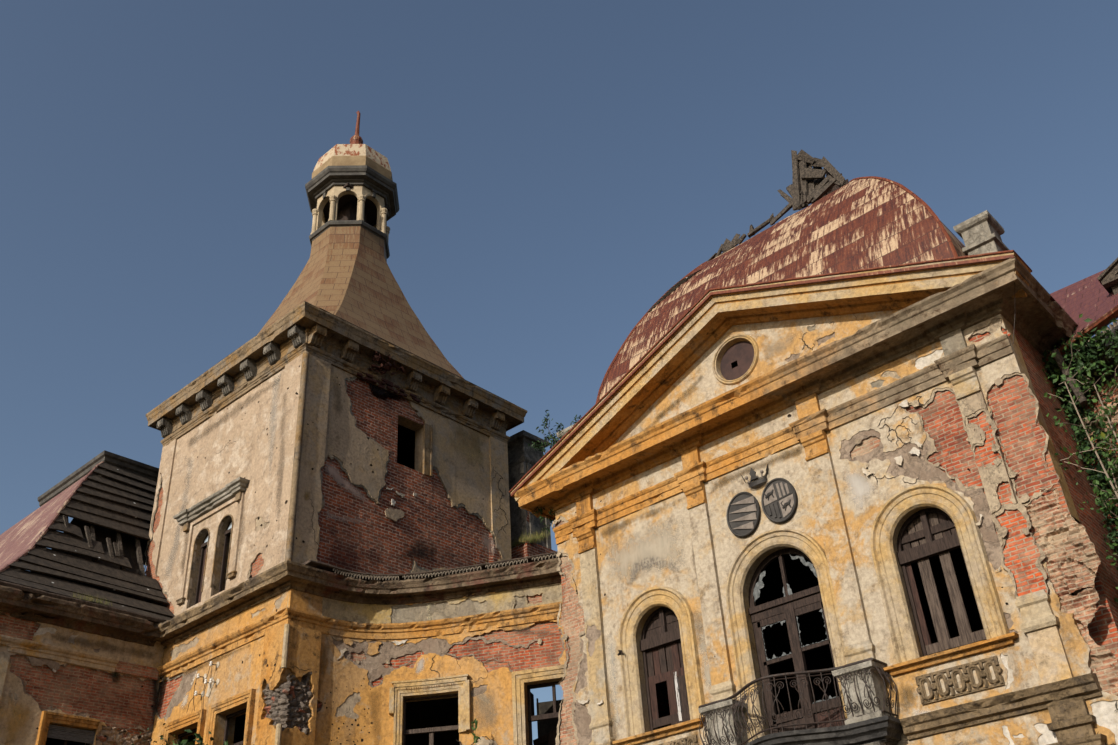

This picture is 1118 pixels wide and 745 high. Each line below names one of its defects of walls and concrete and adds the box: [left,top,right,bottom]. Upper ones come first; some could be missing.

peeling [871,371,901,388]
flaking render [312,372,502,574]
flaking render [851,437,881,477]
flaking render [894,373,1118,745]
peeling [170,637,199,661]
flaking render [444,552,603,745]
flaking render [10,654,198,745]
spalling [262,650,424,745]